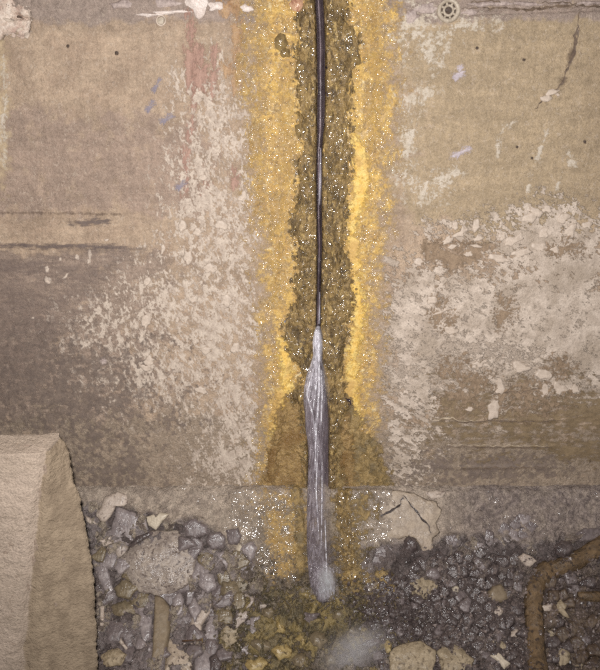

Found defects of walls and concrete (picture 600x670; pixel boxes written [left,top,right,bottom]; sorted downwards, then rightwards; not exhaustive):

leakage [394,84,438,113]
crack [462,0,600,109]
leakage [392,126,465,207]
leakage [0,0,420,670]
peeling [380,186,600,487]
leakage [401,363,600,487]
crack [381,495,431,533]